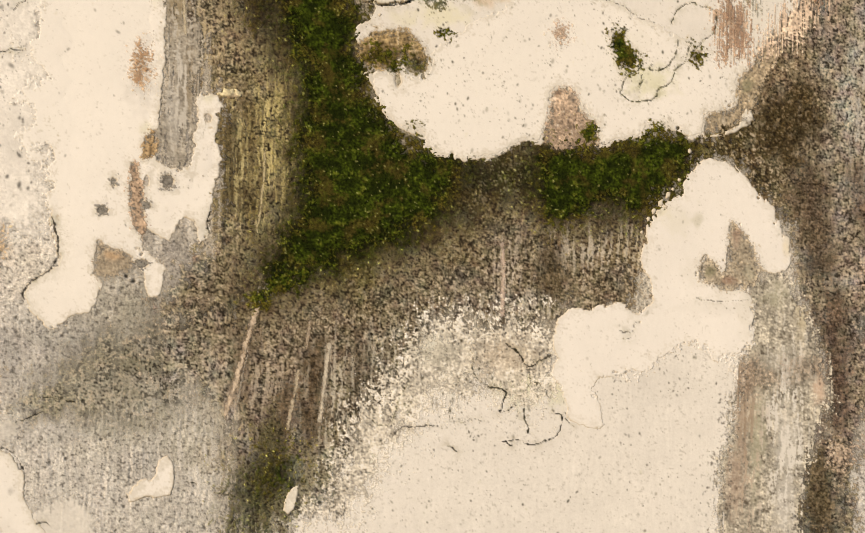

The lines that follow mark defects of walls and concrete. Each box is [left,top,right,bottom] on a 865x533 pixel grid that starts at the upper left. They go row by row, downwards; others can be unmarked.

peeling [0,417,101,533]
peeling [0,0,242,330]
peeling [127,455,175,502]
water stain [0,0,657,533]
crack [472,343,568,446]
peeling [266,0,840,533]
water stain [653,0,865,533]